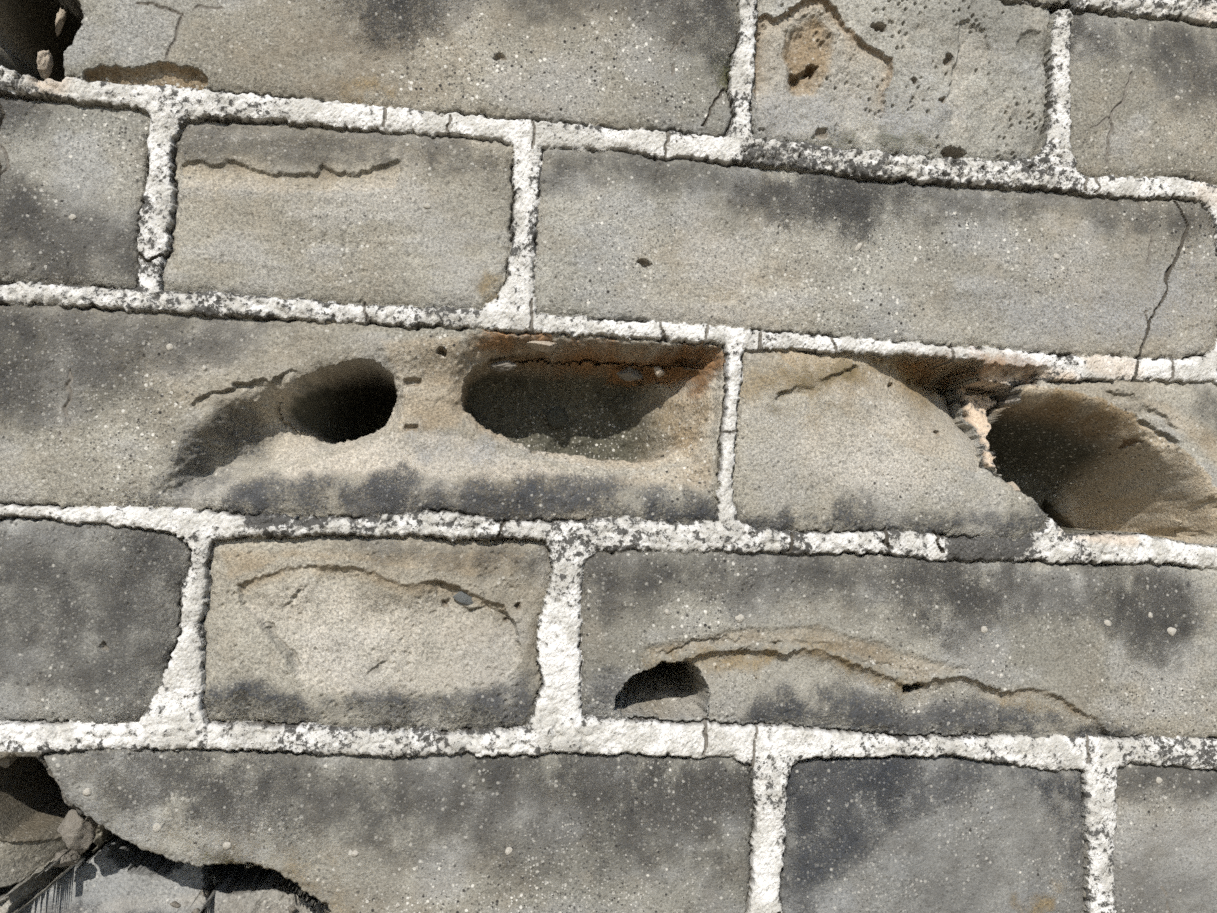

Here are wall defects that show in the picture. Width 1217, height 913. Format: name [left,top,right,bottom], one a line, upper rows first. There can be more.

spalling [752,0,894,150]
crack [0,91,10,177]
crack [1130,195,1190,382]
water stain [129,409,719,525]
water stain [737,491,1048,538]
spalling [1167,493,1217,542]
spalling [681,648,1110,738]